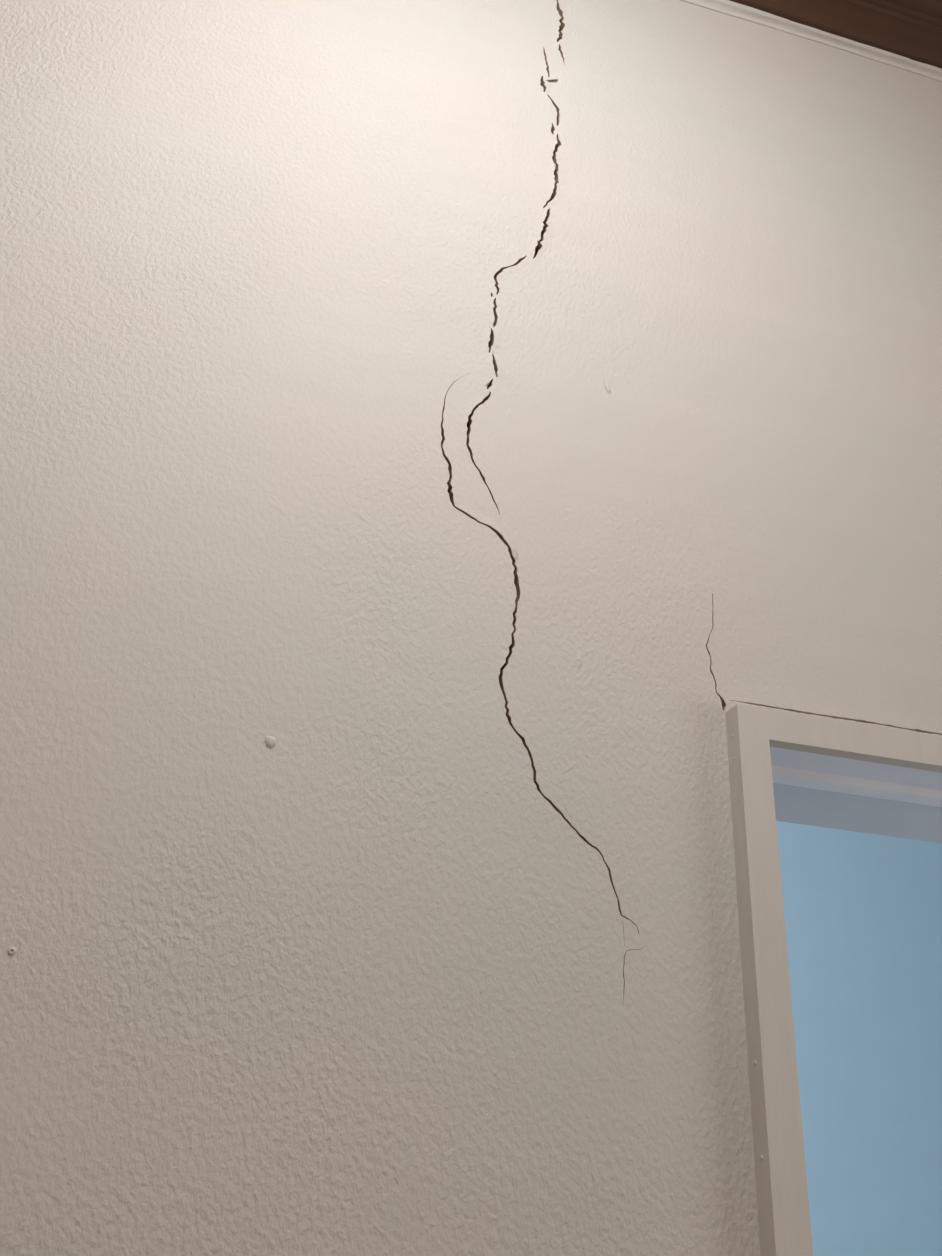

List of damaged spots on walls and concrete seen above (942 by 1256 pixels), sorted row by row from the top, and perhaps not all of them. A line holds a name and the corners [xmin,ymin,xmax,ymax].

crack [441,0,645,1001]